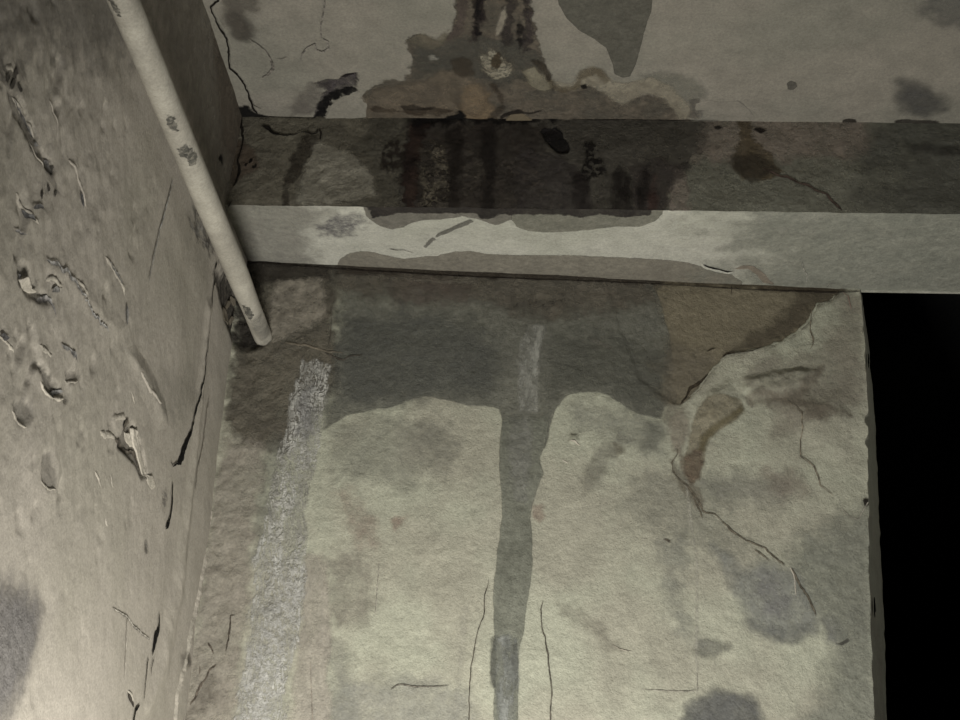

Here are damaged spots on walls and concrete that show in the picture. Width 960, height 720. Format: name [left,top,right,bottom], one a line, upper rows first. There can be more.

flaking render [1,63,57,199]
crack [210,0,330,207]
leakage [159,0,960,405]
peeling [18,276,37,293]
peeling [39,368,64,402]
peeling [100,412,167,507]
crack [166,263,217,529]
leakage [185,205,671,720]
crack [671,451,816,615]
leakage [0,589,39,714]
crack [113,609,160,720]
leakage [684,692,760,720]